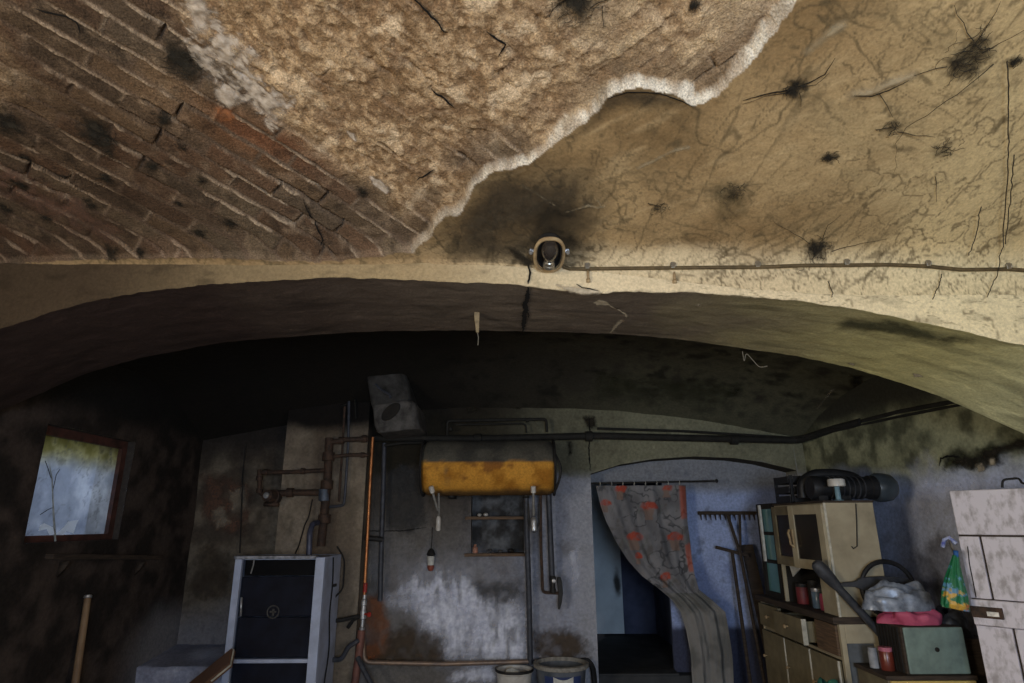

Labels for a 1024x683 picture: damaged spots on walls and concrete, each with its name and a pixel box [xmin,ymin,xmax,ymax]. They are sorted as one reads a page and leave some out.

crack [414,0,448,33]
efflorescence [184,0,296,132]
crack [487,32,506,57]
crack [607,92,693,107]
crack [743,58,835,101]
flaking render [0,0,795,263]
leakage [510,249,531,266]
crack [521,266,531,331]
leakage [842,321,954,342]
leakage [379,573,585,682]